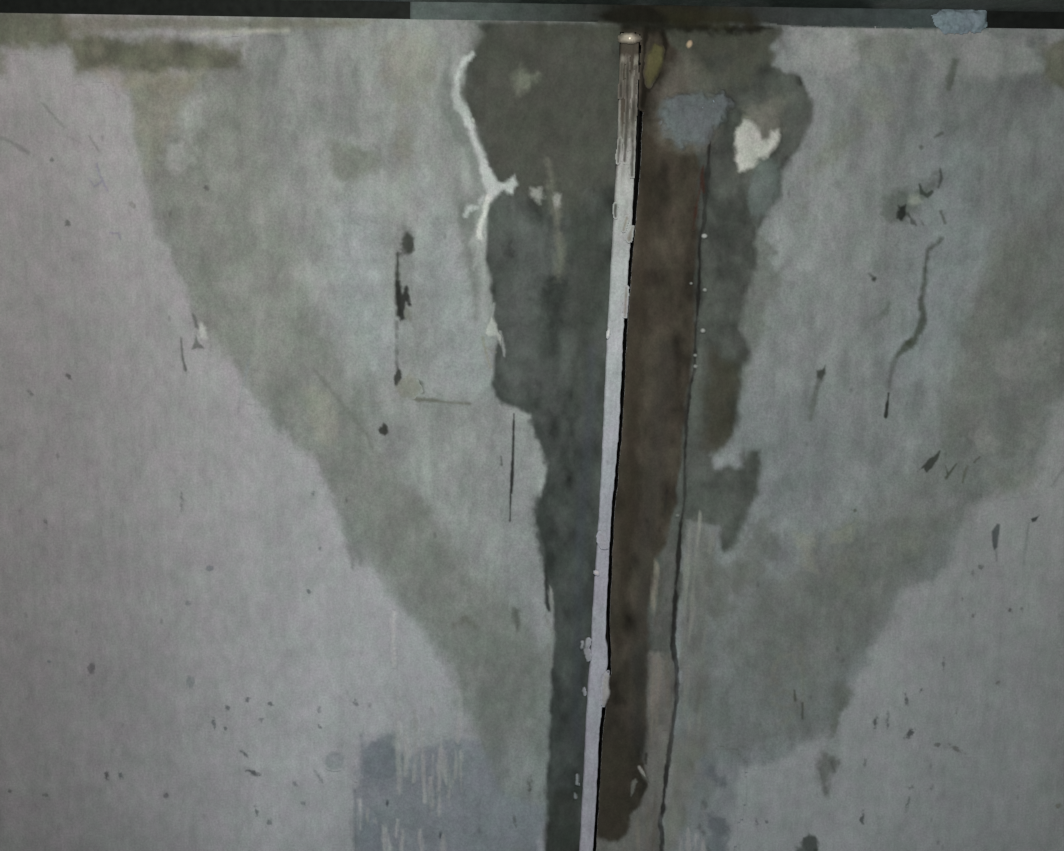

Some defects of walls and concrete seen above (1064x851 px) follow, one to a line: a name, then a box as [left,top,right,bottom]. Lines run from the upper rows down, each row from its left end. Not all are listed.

damp [0,13,549,798]
corrosion [597,32,733,848]
crack [652,139,713,851]
damp [323,0,1064,851]
spalling [732,113,783,174]